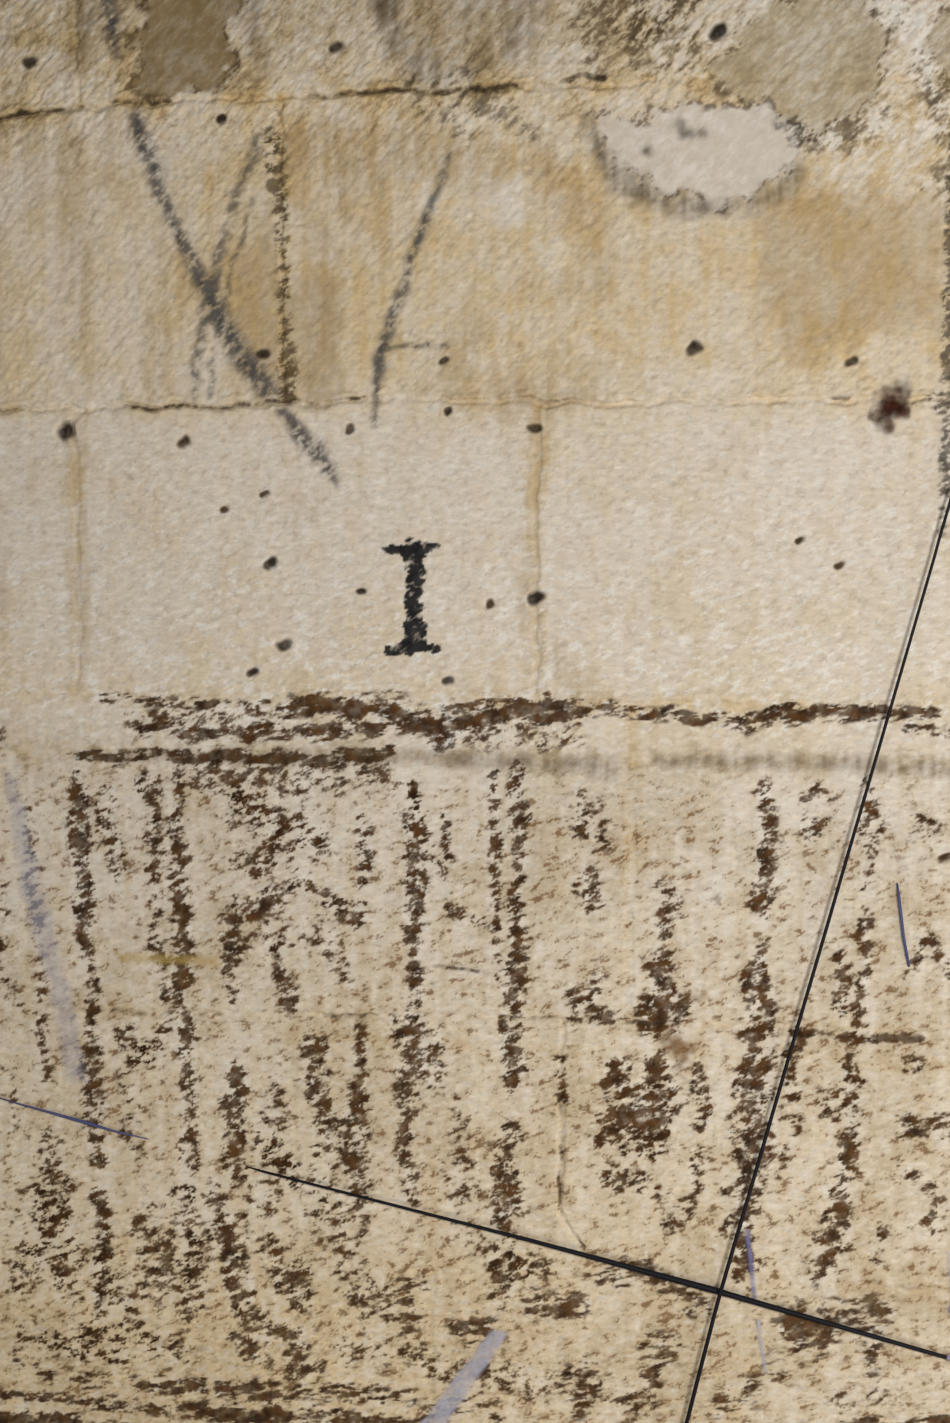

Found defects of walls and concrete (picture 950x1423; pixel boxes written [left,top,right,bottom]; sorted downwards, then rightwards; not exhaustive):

peeling [129,0,243,98]
corrosion [870,387,910,432]
corrosion [670,1040,688,1058]